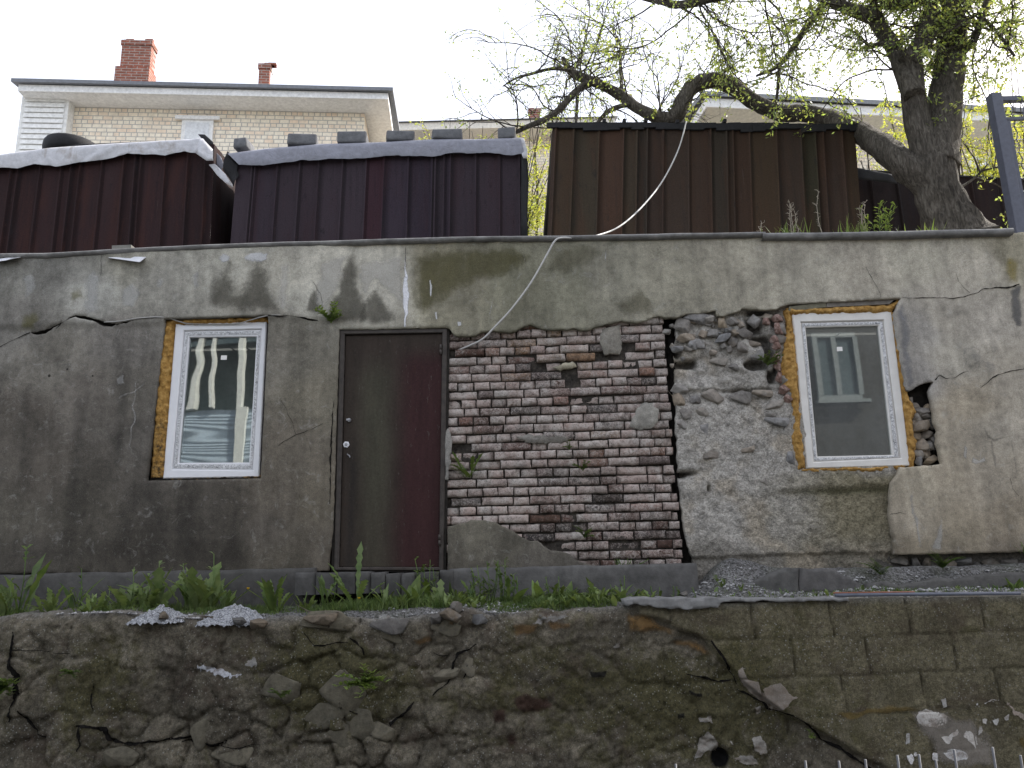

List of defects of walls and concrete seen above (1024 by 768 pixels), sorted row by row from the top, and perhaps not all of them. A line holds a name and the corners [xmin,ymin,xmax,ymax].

damp [212,253,273,309]
damp [309,294,318,310]
damp [333,263,391,322]
crack [870,275,1020,299]
crack [0,315,157,347]
crack [935,369,1022,387]
spalling [441,306,1024,582]
crack [6,632,70,737]
crack [687,640,871,768]
peeling [906,733,917,764]
peeling [917,698,1024,761]